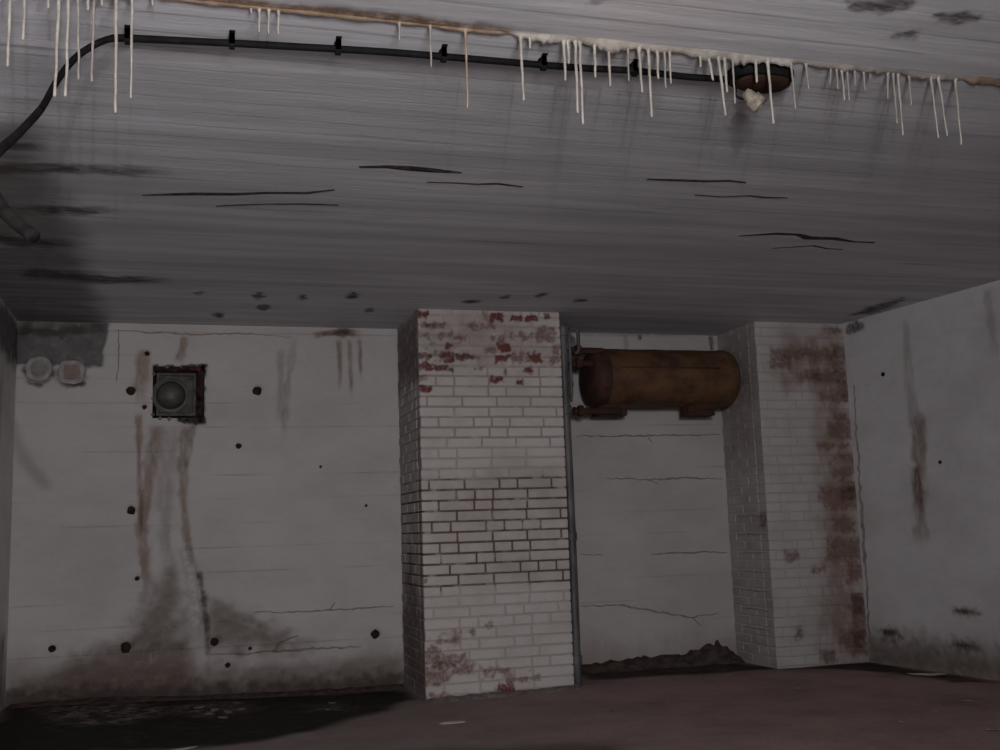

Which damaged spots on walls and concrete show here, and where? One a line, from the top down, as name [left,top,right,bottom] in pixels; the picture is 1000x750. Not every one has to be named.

water stain [6,0,27,67]
water stain [47,0,118,114]
water stain [509,31,1000,145]
water stain [0,134,151,323]
peeling [418,310,474,393]
peeling [463,300,558,384]
crack [583,604,718,627]